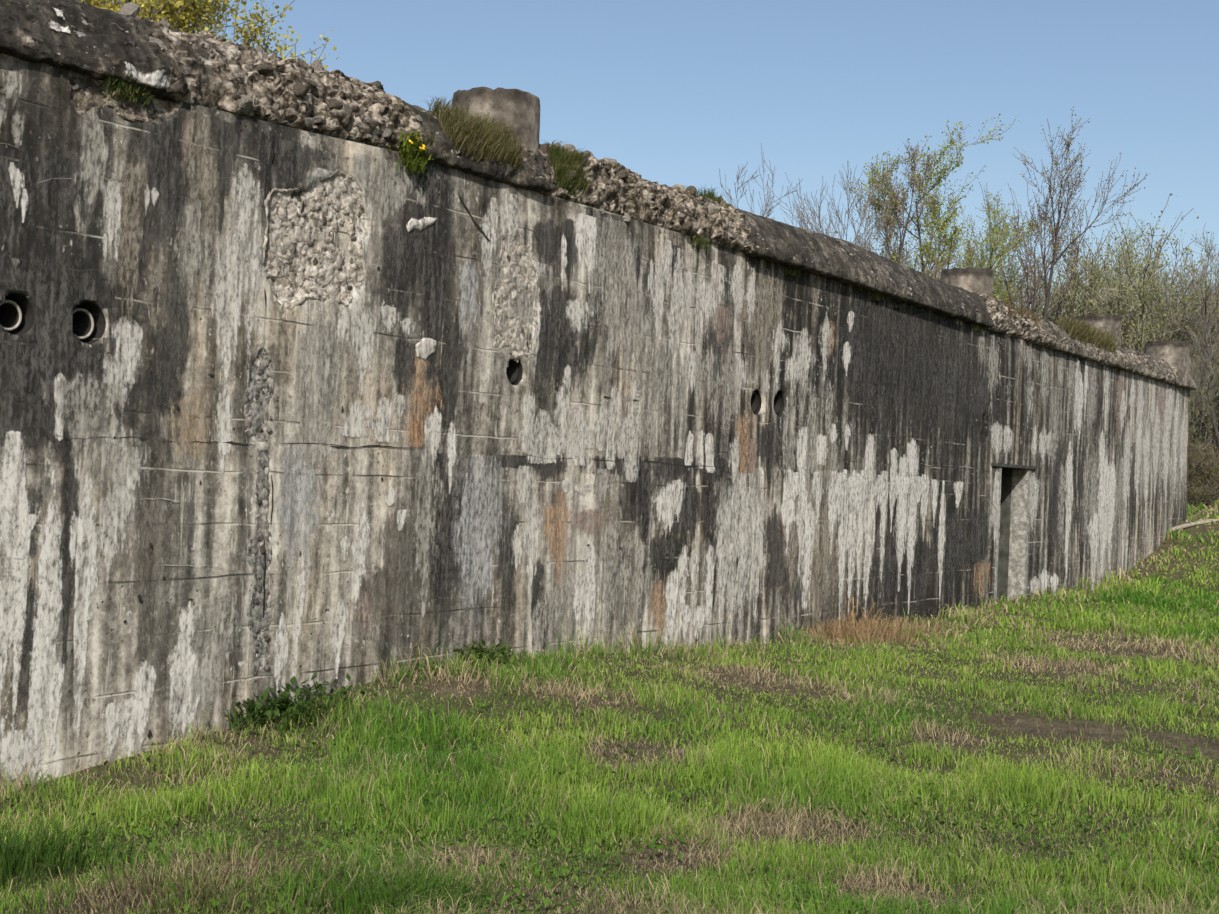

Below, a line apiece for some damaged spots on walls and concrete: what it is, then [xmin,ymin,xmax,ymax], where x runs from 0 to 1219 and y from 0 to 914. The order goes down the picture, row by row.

leakage [123,62,169,88]
spalling [263,169,380,311]
spalling [227,346,275,677]
corrosion [403,353,442,447]
leakage [0,71,1013,783]
corrosion [545,489,622,582]
corrosion [711,265,791,479]
leakage [1021,346,1186,595]